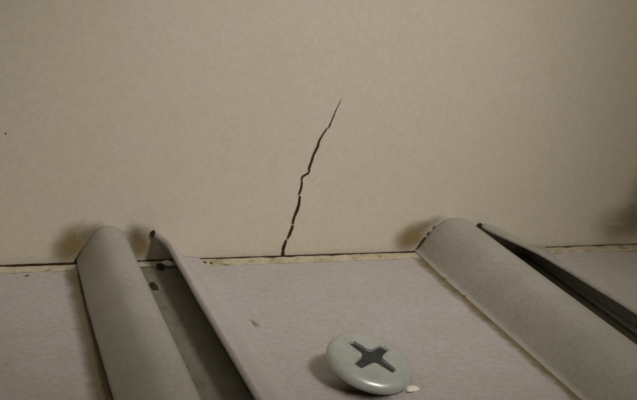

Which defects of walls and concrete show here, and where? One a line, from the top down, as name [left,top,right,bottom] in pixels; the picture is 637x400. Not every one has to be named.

crack [281,98,342,255]